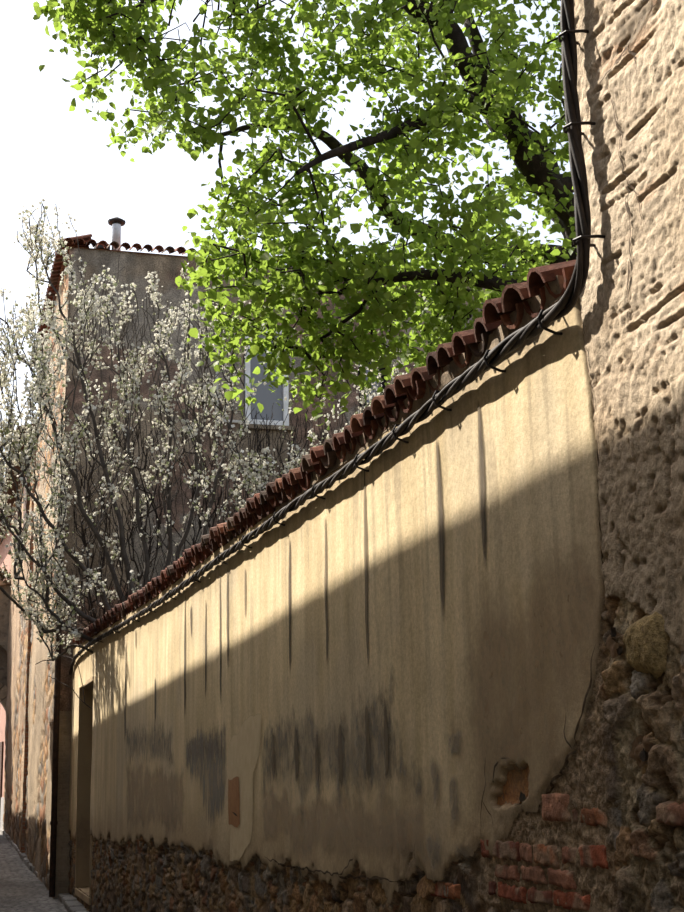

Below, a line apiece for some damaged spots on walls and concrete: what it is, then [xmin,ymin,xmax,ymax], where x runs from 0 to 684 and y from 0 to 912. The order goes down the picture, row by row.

crack [599,2,654,322]
damp [436,442,444,610]
damp [478,405,486,556]
damp [124,657,172,760]
damp [186,729,225,819]
peeling [228,714,261,861]
damp [263,678,406,793]
flaking render [492,757,530,806]
flaking render [542,793,608,827]
flaking render [656,800,684,827]
flaking render [480,839,609,911]